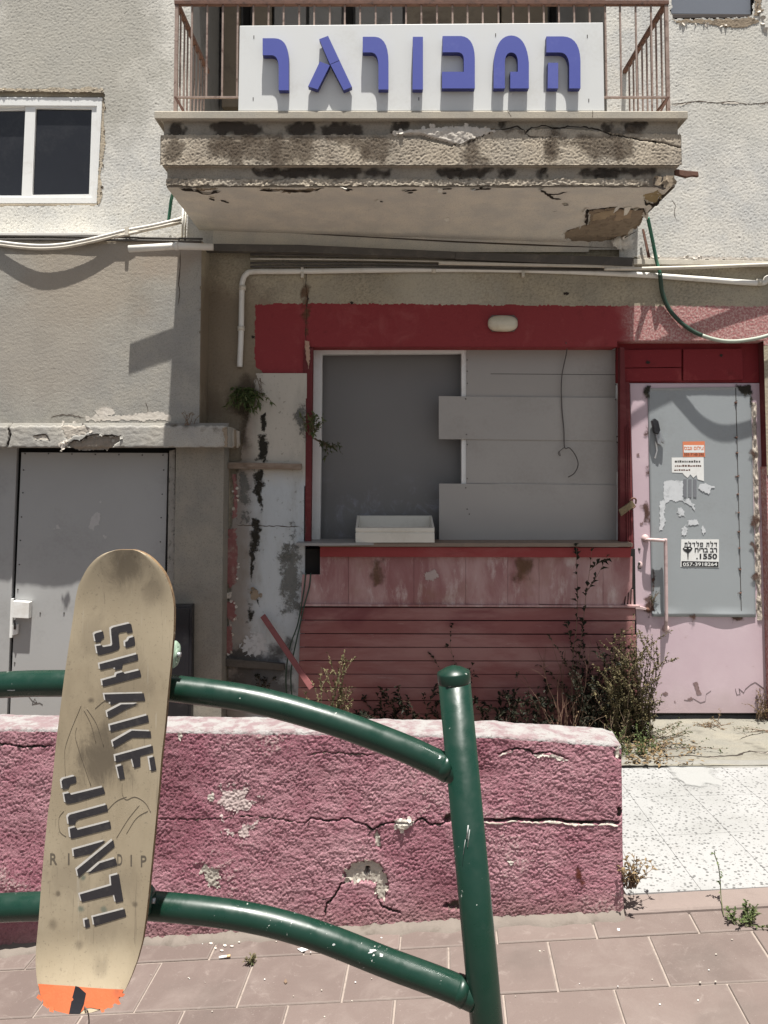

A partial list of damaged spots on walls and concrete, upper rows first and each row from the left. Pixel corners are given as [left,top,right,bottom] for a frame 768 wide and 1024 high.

damp [166,123,187,161]
damp [210,121,409,179]
flaking render [392,123,496,146]
spalling [565,175,677,242]
peeling [33,407,171,452]
damp [239,413,269,578]
damp [278,522,305,614]
crack [498,748,565,758]
crack [172,815,450,836]
crack [484,817,618,827]
crack [322,882,345,915]
flaking render [342,860,389,903]